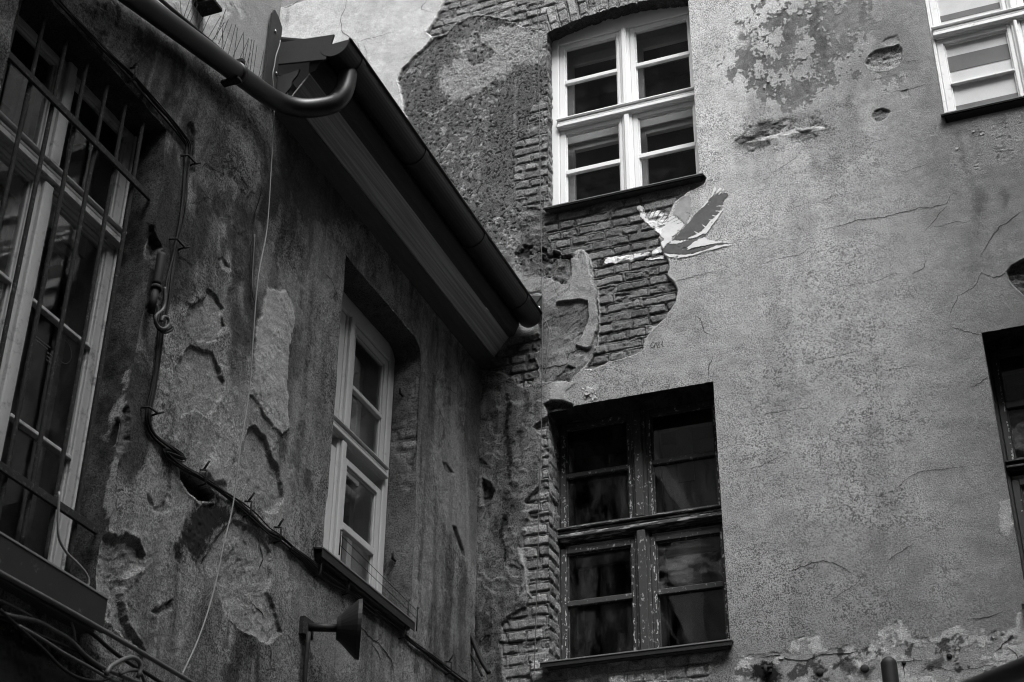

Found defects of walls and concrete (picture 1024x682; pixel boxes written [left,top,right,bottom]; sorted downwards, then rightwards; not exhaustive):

crack [759,195,969,264]
crack [949,210,1024,335]
spalling [115,400,133,466]
spalling [146,464,216,516]
spalling [172,287,228,420]
flaking render [238,287,295,515]
spalling [396,0,1024,682]
spalling [95,529,149,653]
spalling [151,596,175,617]
spalling [201,517,283,645]
crack [785,544,914,600]